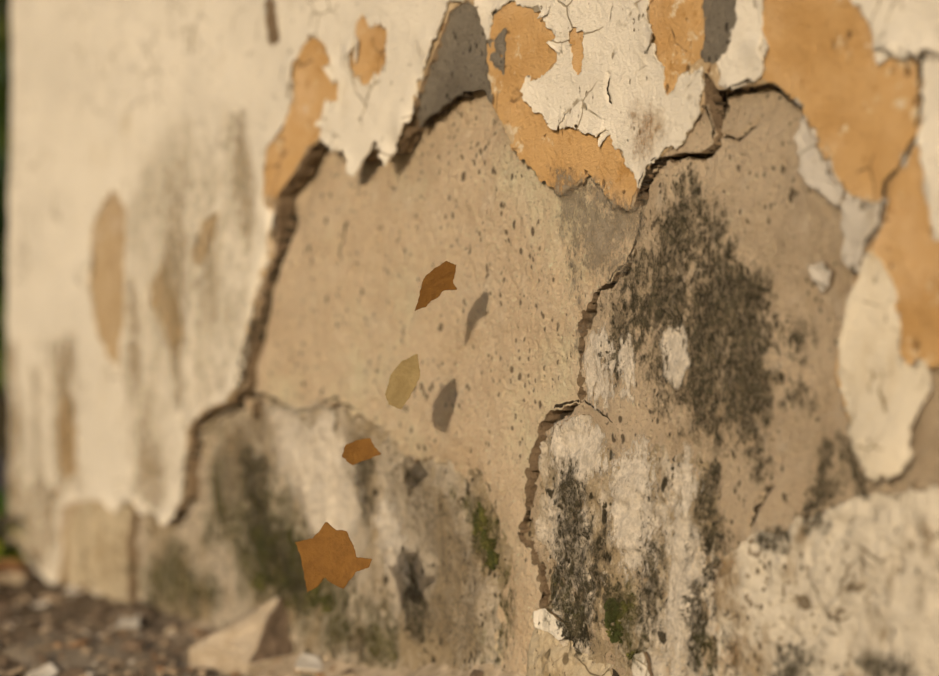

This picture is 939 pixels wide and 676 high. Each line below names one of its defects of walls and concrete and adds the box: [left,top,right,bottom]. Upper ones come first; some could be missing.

peeling [87,190,127,371]
peeling [112,613,140,629]
crack [174,204,357,528]
damp [222,404,481,650]
spalling [135,0,643,676]
crack [554,399,613,423]
damp [547,167,817,676]
crack [595,78,784,296]
spalling [556,0,939,676]
damp [803,434,873,537]
damp [855,652,916,676]